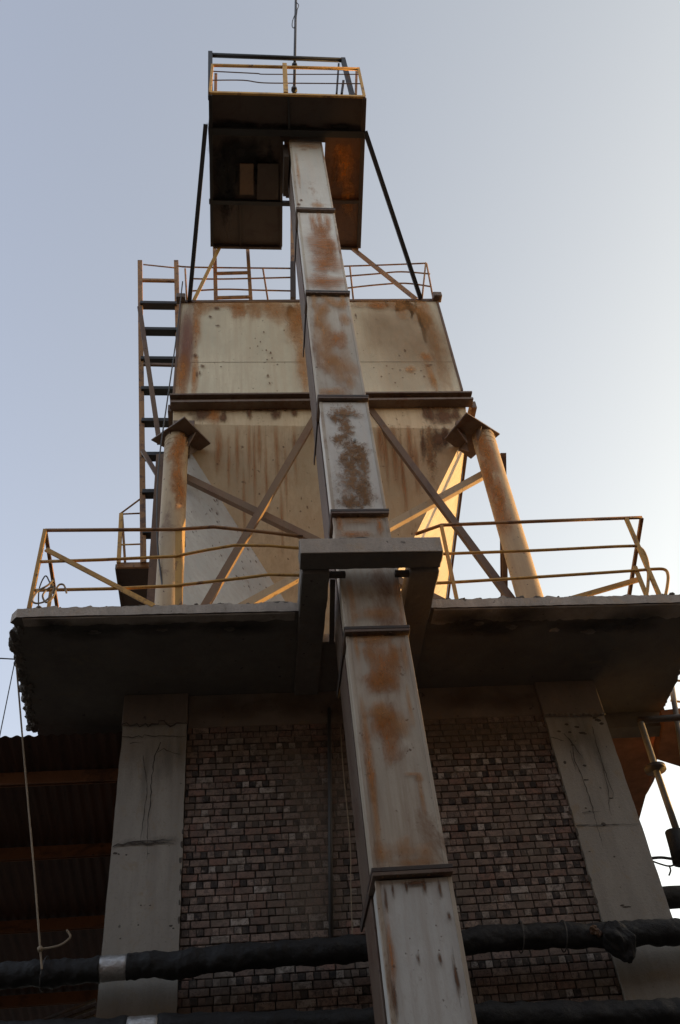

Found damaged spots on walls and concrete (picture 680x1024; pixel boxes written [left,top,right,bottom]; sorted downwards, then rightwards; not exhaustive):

corrosion [176,303,245,388]
corrosion [328,390,373,536]
corrosion [479,434,505,526]
crack [113,720,186,855]
crack [552,727,630,845]